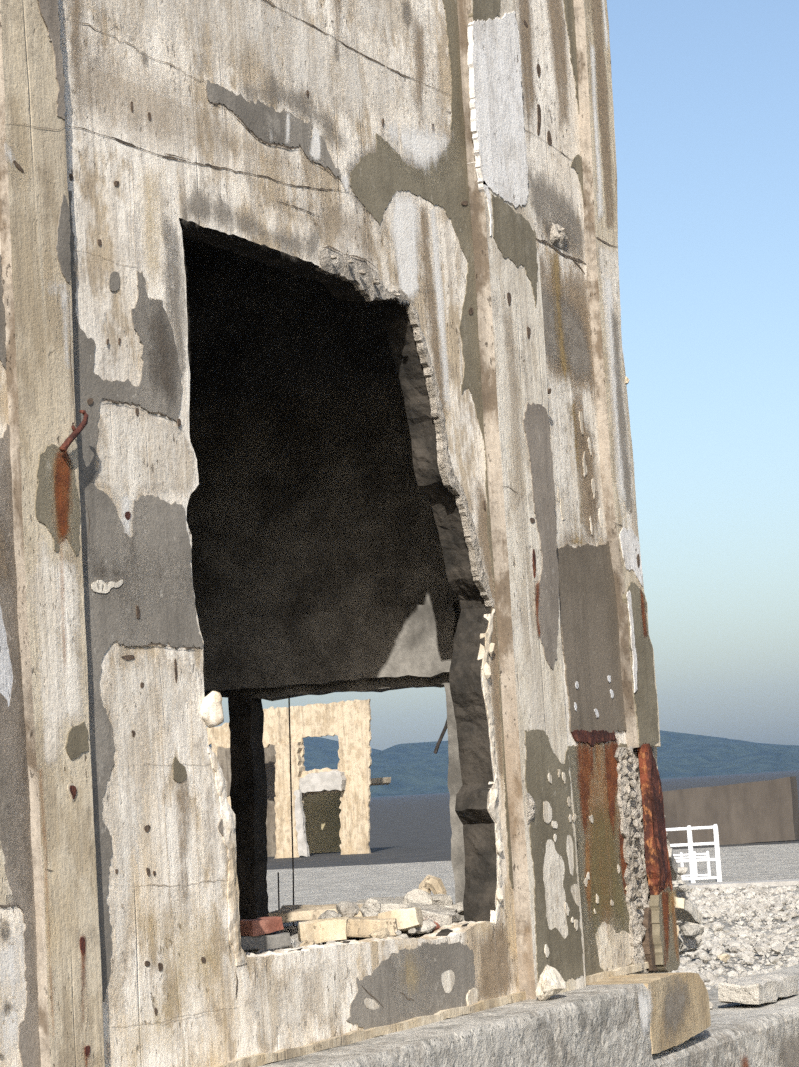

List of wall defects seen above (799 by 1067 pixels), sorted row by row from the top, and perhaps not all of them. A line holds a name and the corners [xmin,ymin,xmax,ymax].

peeling [37,0,66,120]
crack [15,1,356,267]
crack [264,0,450,95]
crack [323,246,382,276]
corrosion [55,450,69,537]
peeling [206,0,514,924]
peeling [35,173,203,1002]
peeling [522,388,659,982]
corrosion [571,729,627,908]
corrosion [637,743,676,965]
peeling [346,941,475,1030]